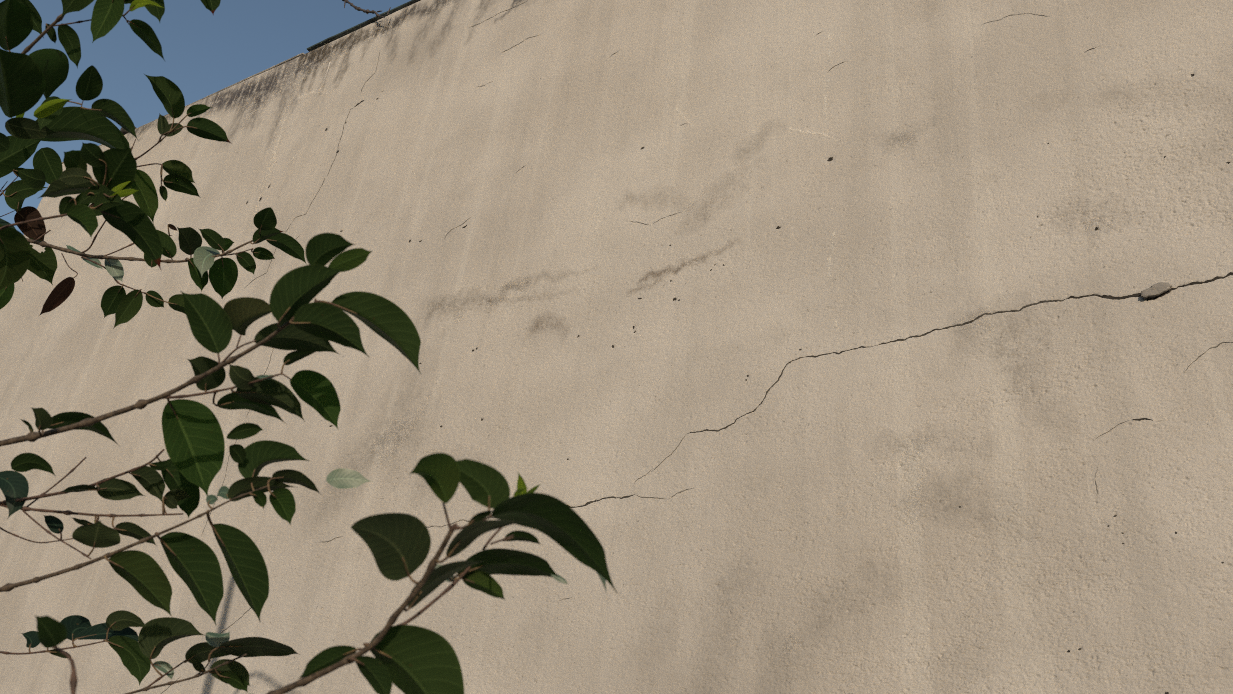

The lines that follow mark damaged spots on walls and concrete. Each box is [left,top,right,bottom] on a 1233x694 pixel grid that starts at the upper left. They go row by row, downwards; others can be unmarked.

leakage [212,5,438,160]
crack [568,272,1233,508]